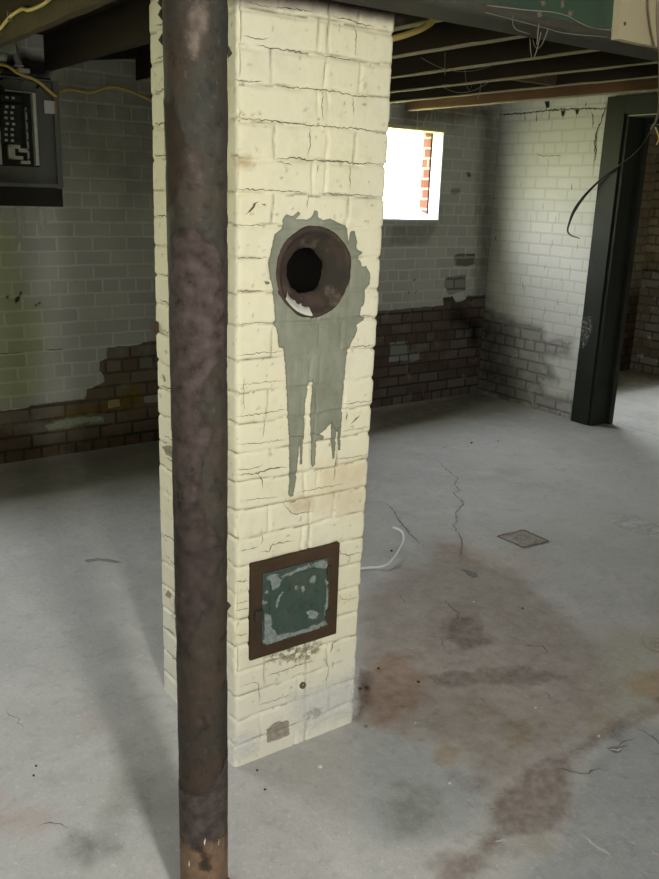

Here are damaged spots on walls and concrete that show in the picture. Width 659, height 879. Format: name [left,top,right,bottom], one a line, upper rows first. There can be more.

corrosion [185,0,209,60]
corrosion [163,99,205,207]
crack [235,16,382,203]
peeling [620,125,659,376]
peeling [370,254,592,419]
peeling [0,341,172,464]
corrosion [169,225,225,656]
crack [437,444,464,566]
corrosion [178,749,228,879]